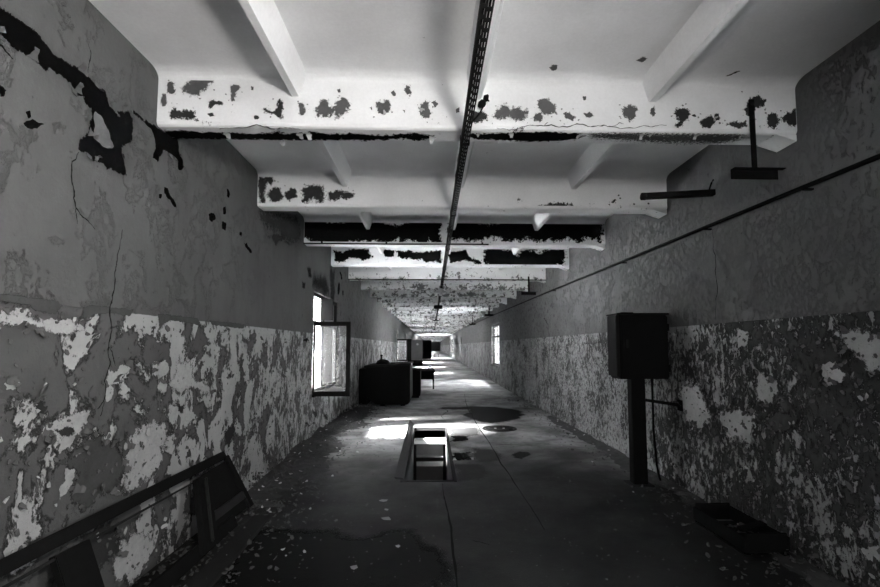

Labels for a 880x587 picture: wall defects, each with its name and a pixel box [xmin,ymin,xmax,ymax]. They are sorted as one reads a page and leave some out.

peeling [0,305,133,357]
peeling [0,314,342,513]
peeling [66,504,190,587]